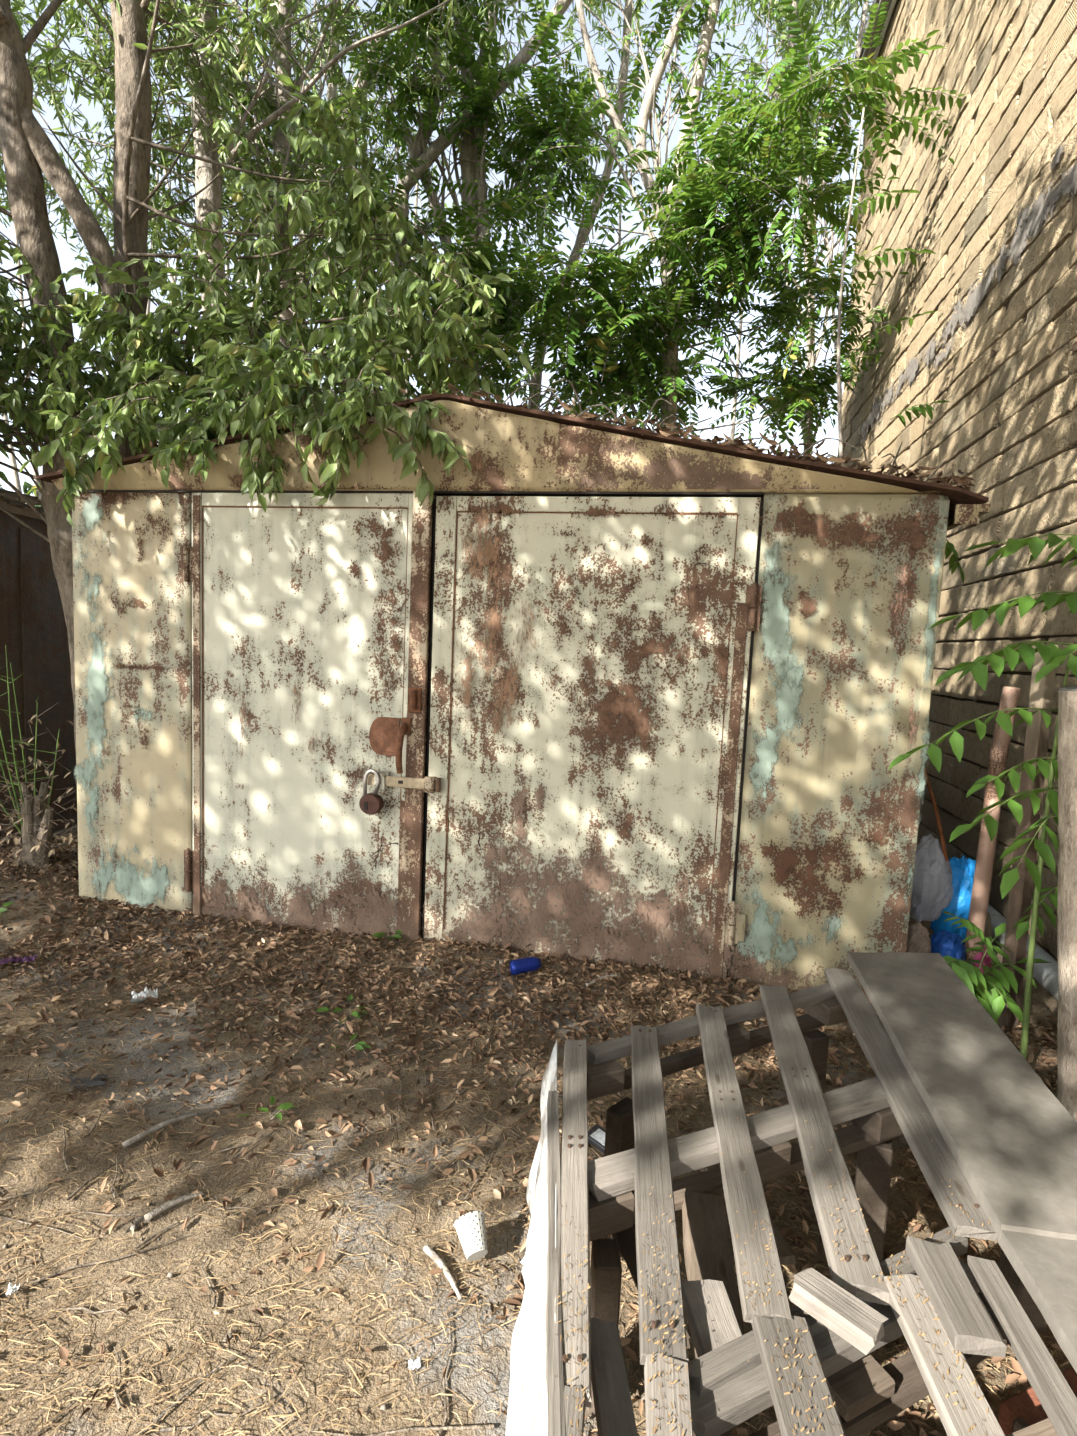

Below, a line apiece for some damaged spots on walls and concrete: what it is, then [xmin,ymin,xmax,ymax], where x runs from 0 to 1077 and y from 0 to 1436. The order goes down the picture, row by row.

corrosion [74,492,191,572]
corrosion [96,596,158,618]
corrosion [268,439,415,712]
corrosion [106,662,192,673]
corrosion [420,437,940,992]
corrosion [332,731,370,813]
corrosion [378,787,400,819]
corrosion [202,847,398,937]